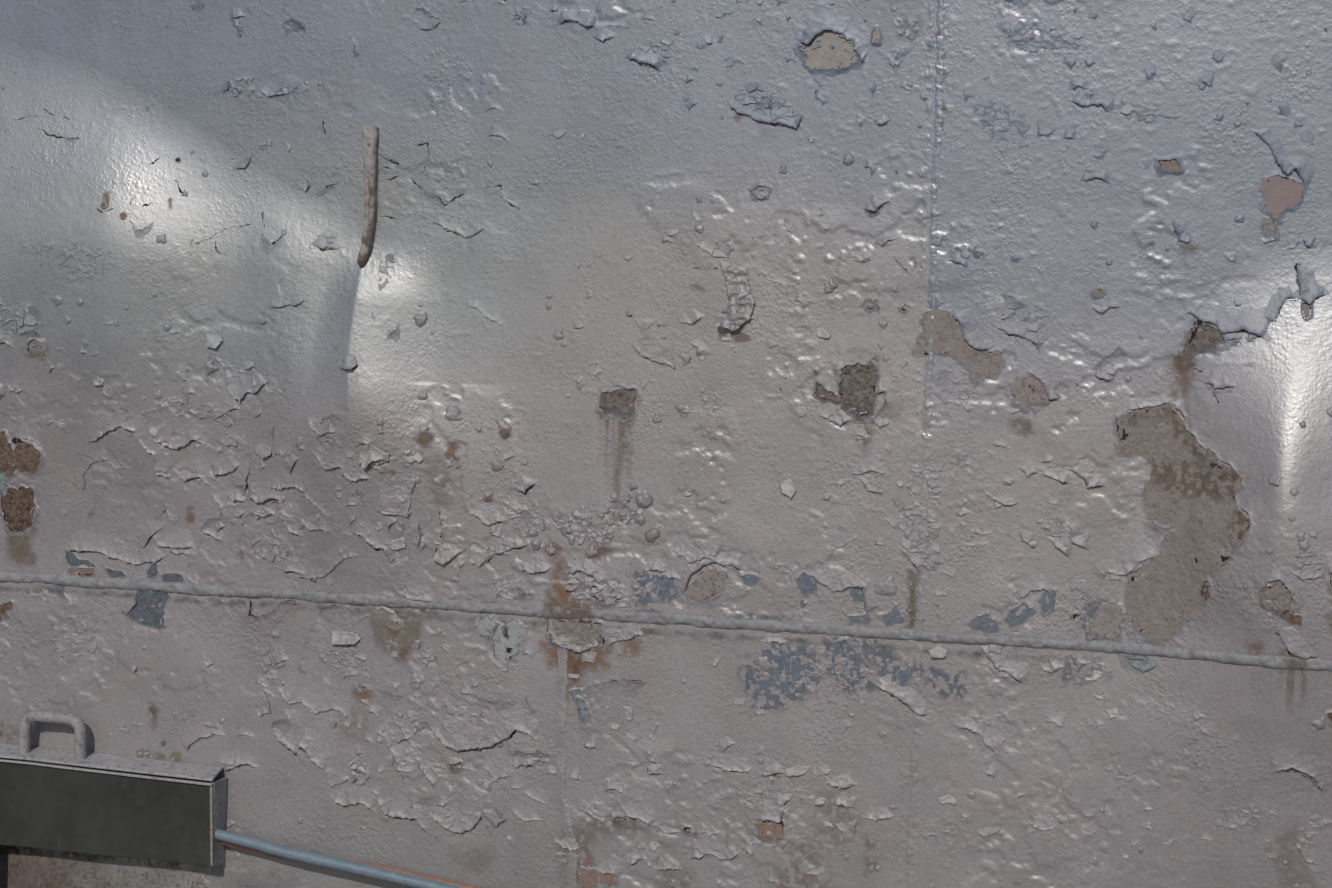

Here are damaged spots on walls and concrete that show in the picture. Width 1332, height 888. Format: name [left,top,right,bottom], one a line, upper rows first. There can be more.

spalling [622,0,920,143]
peeling [371,312,401,342]
peeling [378,249,398,290]
peeling [655,230,759,366]
spalling [1173,94,1332,404]
spalling [0,418,67,539]
spalling [794,242,1332,718]
spalling [0,598,15,633]
peeling [30,327,965,883]
rust [545,564,591,619]
rust [544,646,609,683]
peeling [951,709,1018,783]